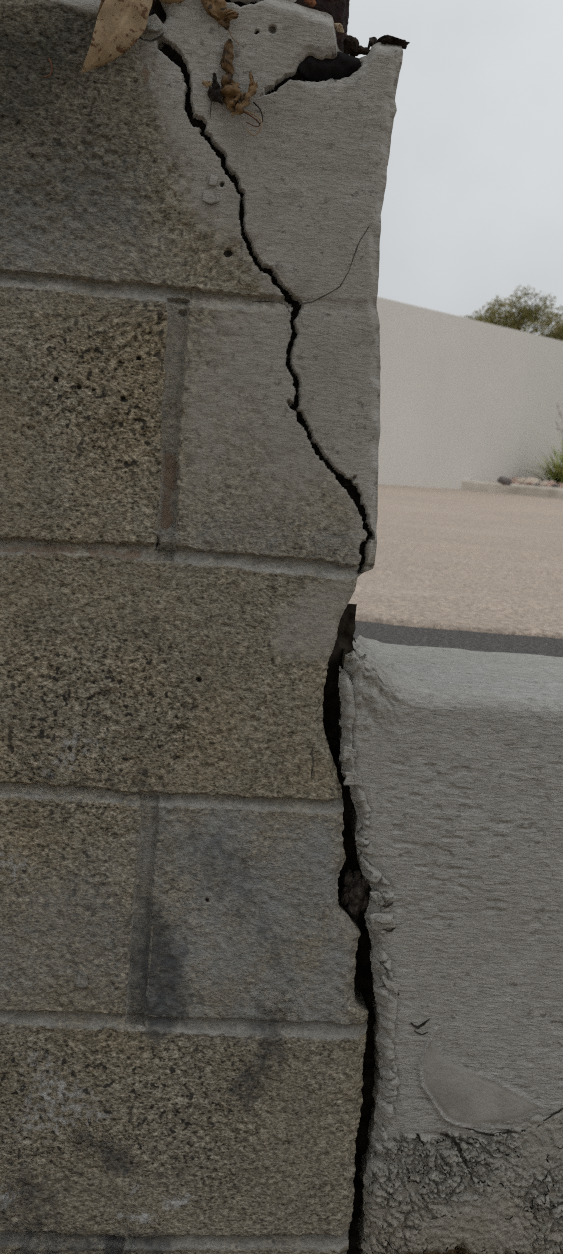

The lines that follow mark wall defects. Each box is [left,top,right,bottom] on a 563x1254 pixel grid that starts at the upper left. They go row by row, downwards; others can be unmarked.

crack [139,33,373,571]
crack [311,603,563,1254]